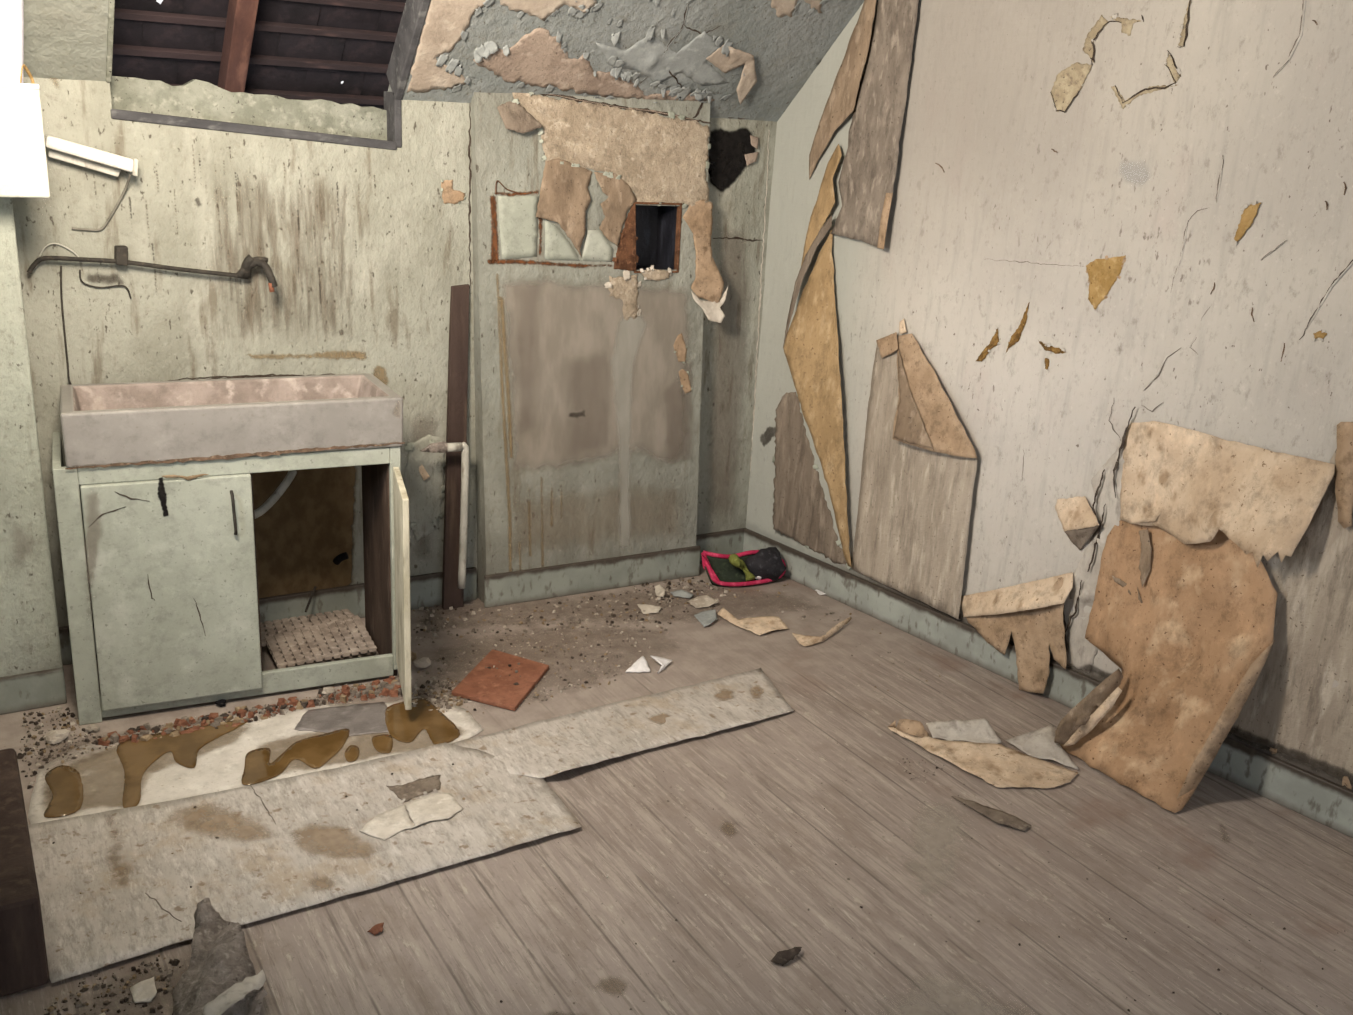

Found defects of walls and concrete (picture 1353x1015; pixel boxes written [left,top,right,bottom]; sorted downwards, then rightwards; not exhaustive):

peeling [771,0,845,17]
crack [1273,0,1306,78]
flaking render [407,0,759,323]
rust [487,191,639,271]
crack [541,4,769,508]
peeling [1086,255,1126,310]
peeling [1234,200,1261,245]
peeling [772,392,851,570]
peeling [1232,449,1353,789]
water stain [294,701,389,736]